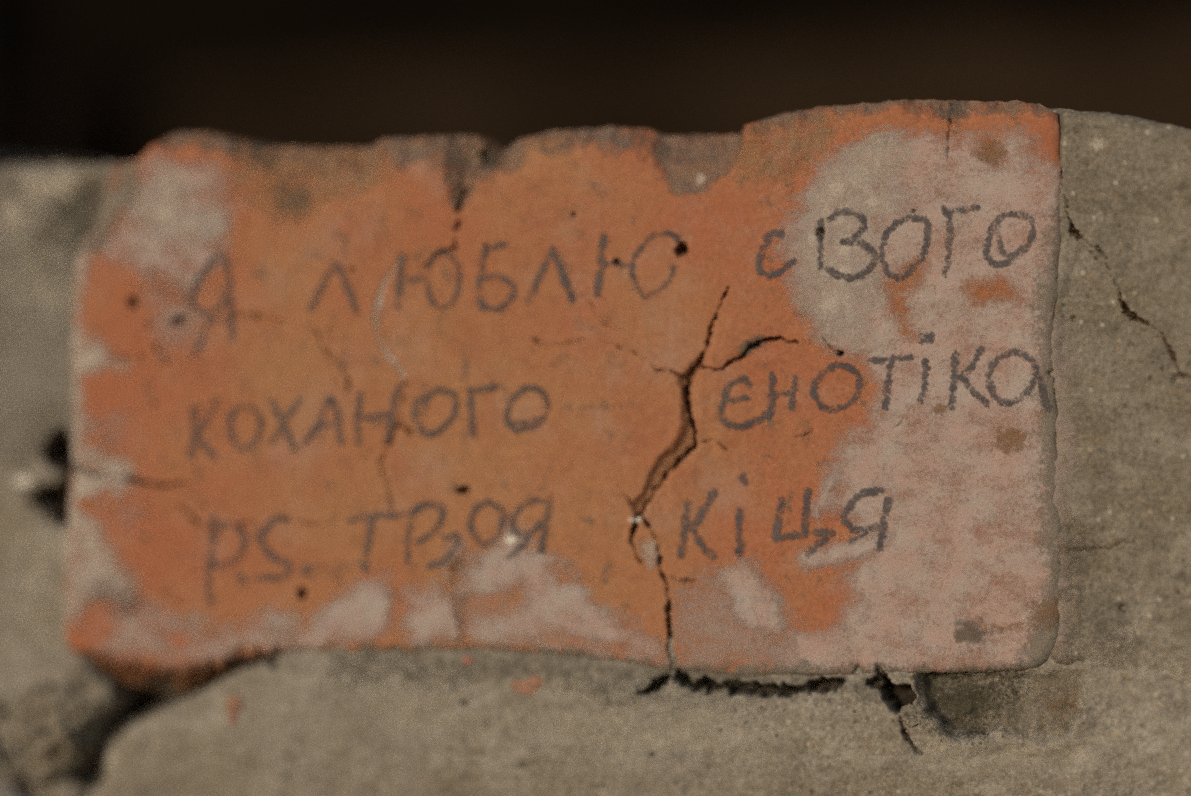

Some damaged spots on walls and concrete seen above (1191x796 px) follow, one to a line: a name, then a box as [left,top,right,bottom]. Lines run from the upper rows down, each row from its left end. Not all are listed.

crack [439,204,461,253]
crack [1067,206,1107,265]
crack [1119,294,1184,377]
crack [372,259,412,503]
water stain [0,125,1112,783]
crack [591,292,797,637]
crack [868,672,893,690]